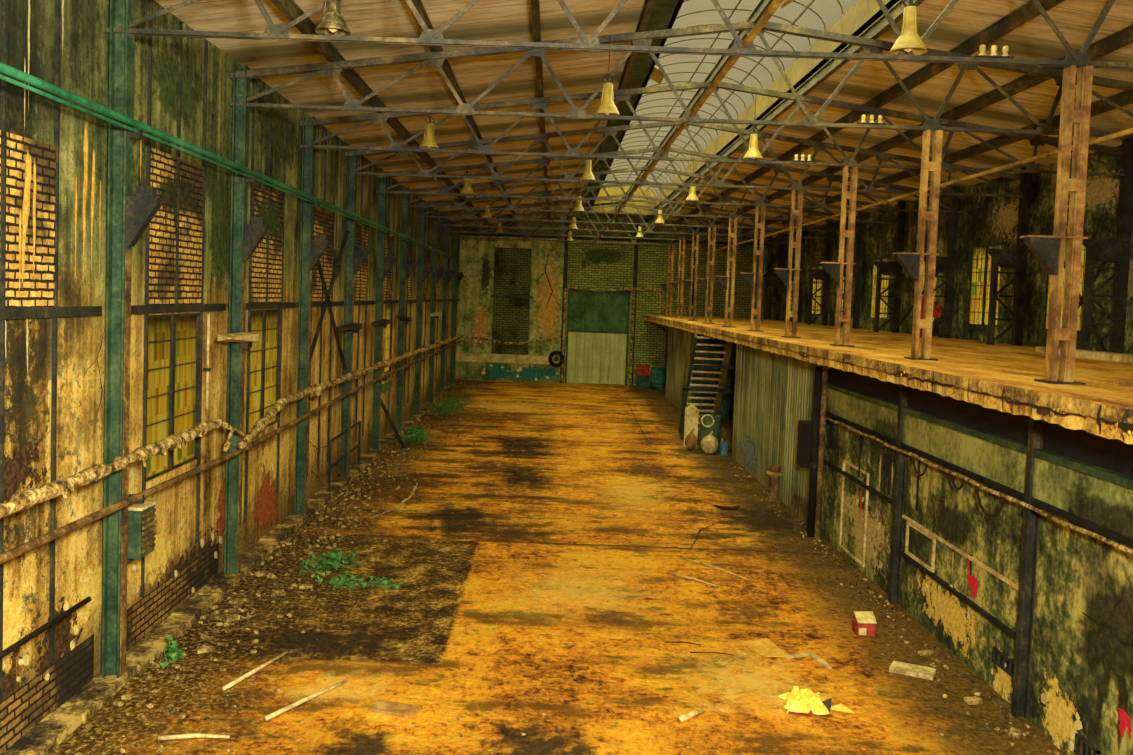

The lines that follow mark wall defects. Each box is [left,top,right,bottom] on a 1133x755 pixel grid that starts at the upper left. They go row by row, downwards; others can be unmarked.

peeling [4,439,47,501]
water stain [872,419,902,492]
water stain [932,497,978,600]
water stain [1068,490,1133,563]
peeling [2,564,103,700]
peeling [914,570,1013,703]
peeling [1041,669,1083,754]
water stain [1083,575,1133,749]